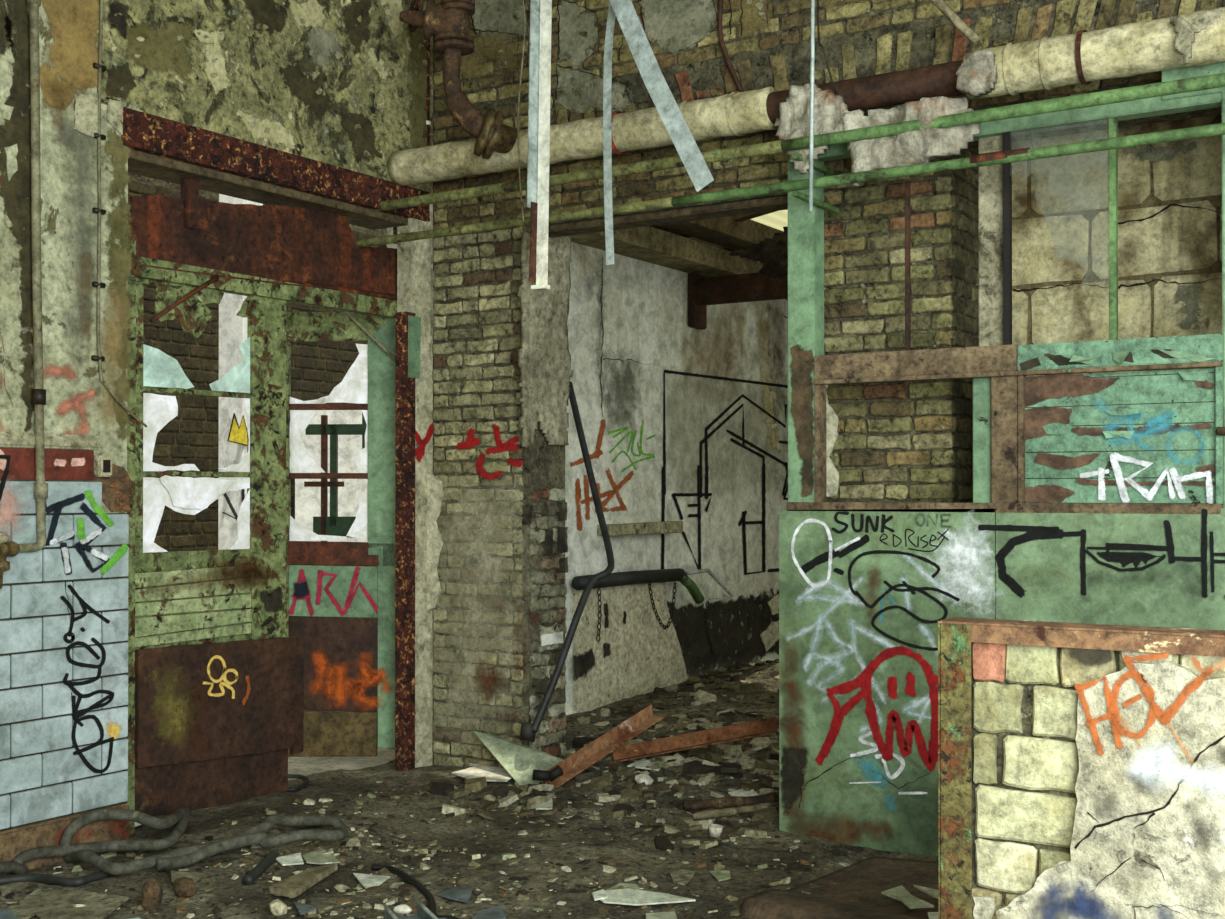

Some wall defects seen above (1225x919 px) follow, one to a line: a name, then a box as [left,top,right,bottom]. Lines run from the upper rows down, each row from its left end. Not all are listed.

peeling [73,2,231,137]
peeling [247,0,431,163]
peeling [237,109,299,151]
peeling [1019,347,1216,503]
flaking render [1071,648,1173,666]
crack [1074,736,1225,849]
peeling [1183,820,1203,853]
flaking render [973,896,995,919]
crack [1093,858,1221,919]